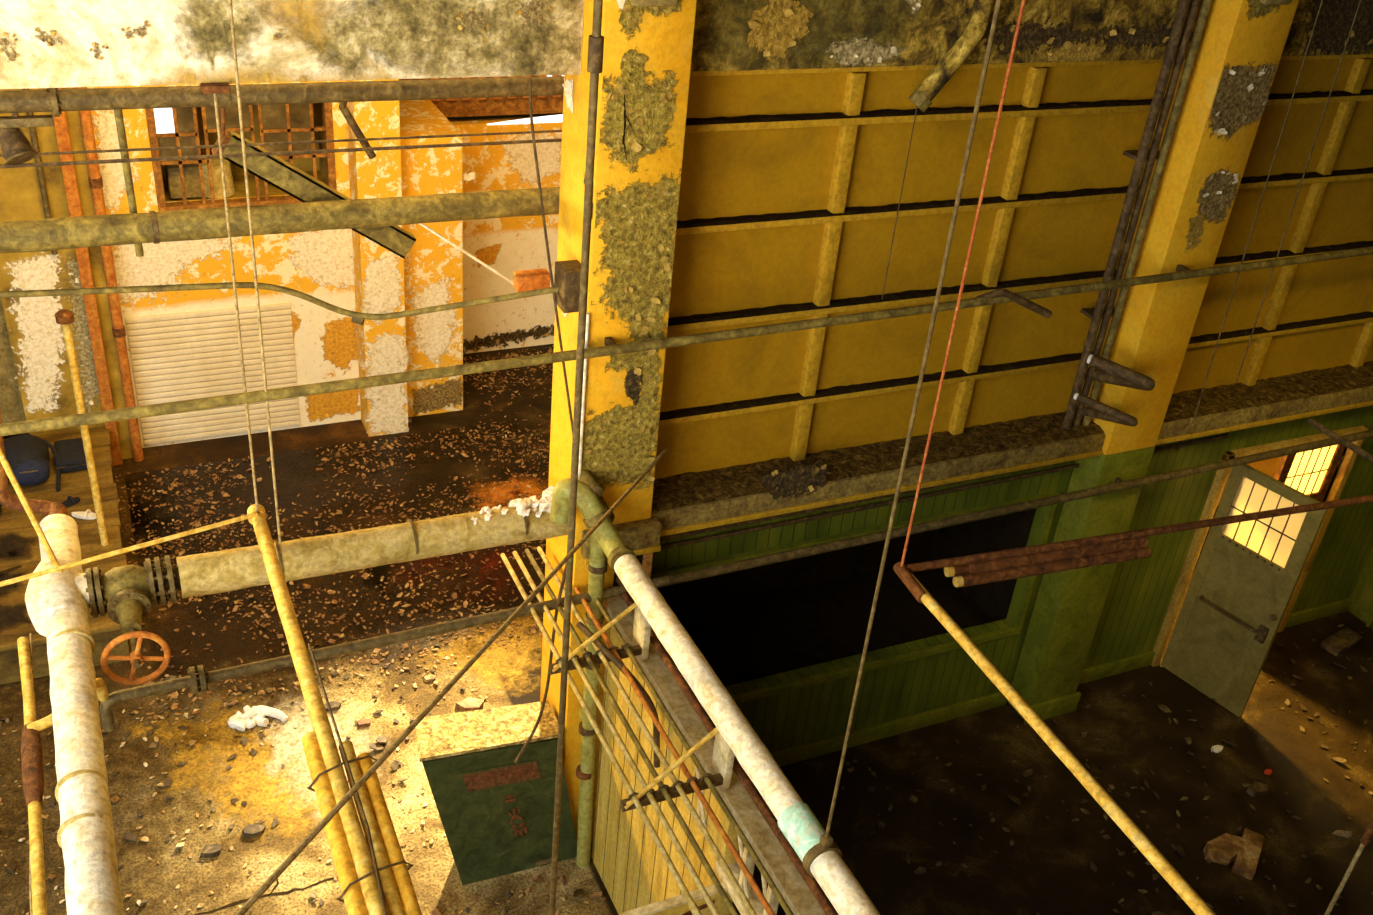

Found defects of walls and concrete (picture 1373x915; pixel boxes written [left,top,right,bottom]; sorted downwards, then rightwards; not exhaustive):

damp [179,0,583,78]
peeling [1208,61,1277,140]
peeling [498,128,562,188]
peeling [112,238,245,309]
peeling [582,0,682,492]
spalling [1185,169,1238,251]
spalling [4,251,108,414]
peeling [287,229,567,436]